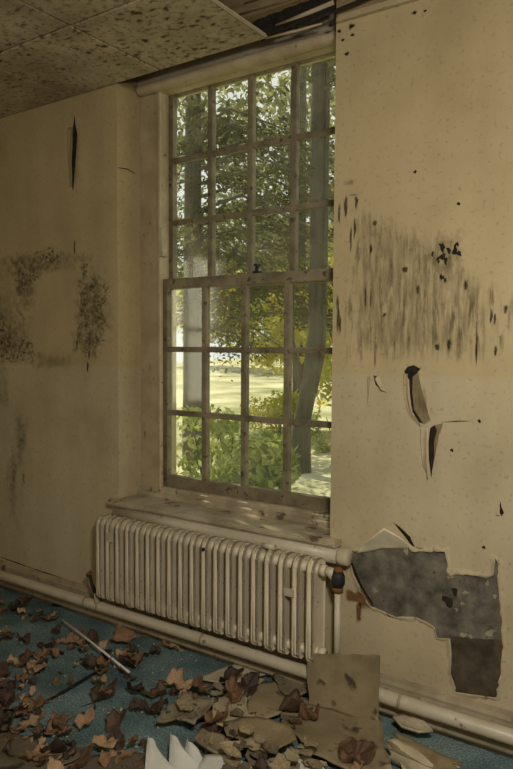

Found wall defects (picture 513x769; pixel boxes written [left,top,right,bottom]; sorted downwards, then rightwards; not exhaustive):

hole [238,0,335,41]
crack [67,116,77,189]
water stain [431,241,461,265]
peeling [403,365,465,479]
peeling [348,523,509,701]